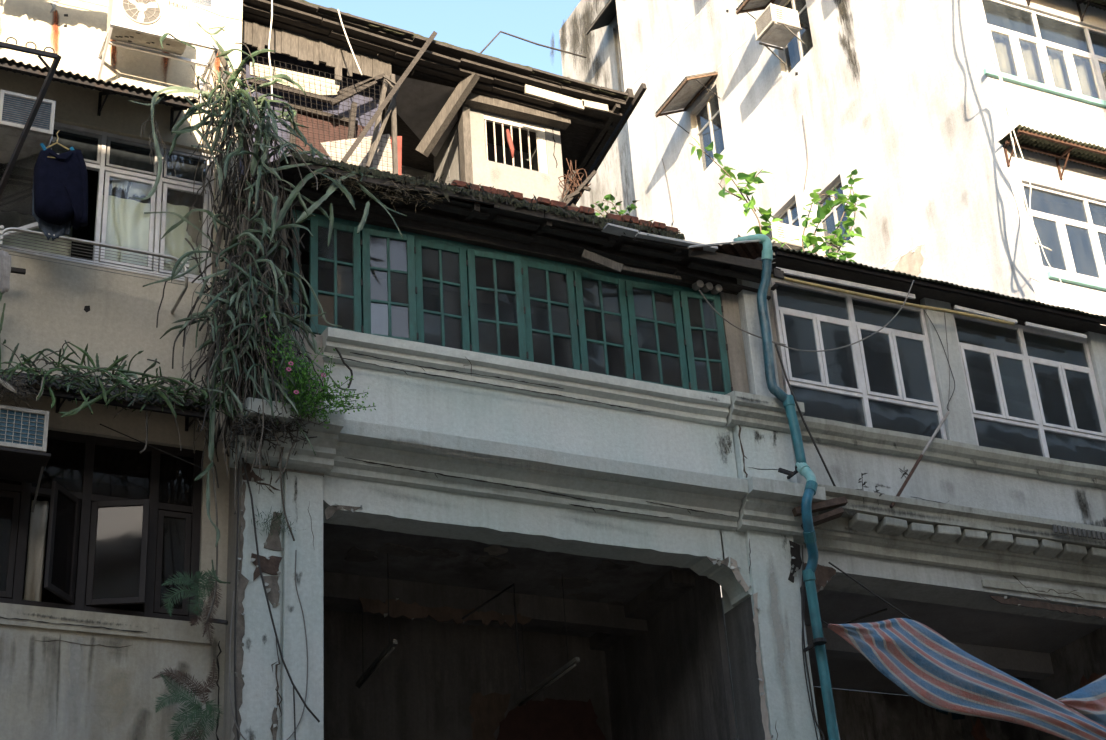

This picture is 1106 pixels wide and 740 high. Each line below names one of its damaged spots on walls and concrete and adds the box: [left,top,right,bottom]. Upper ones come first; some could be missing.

corrosion [51,10,59,50]
leakage [835,0,859,77]
peeling [894,245,924,277]
peeling [232,463,284,740]
spalling [990,596,1106,619]
peeling [706,556,773,740]
peeling [1079,673,1106,689]